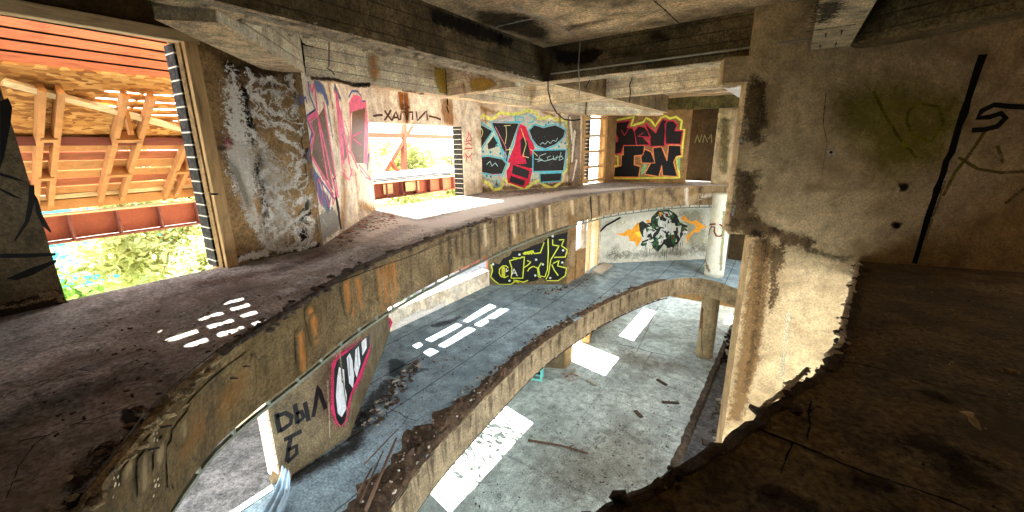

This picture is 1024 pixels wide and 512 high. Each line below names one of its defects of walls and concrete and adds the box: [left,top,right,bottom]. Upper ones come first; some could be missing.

water stain [219,55,319,263]
spalling [65,217,492,512]
water stain [430,5,631,67]
water stain [596,189,648,217]
spalling [581,261,873,512]
water stain [722,77,787,147]
water stain [664,169,853,421]